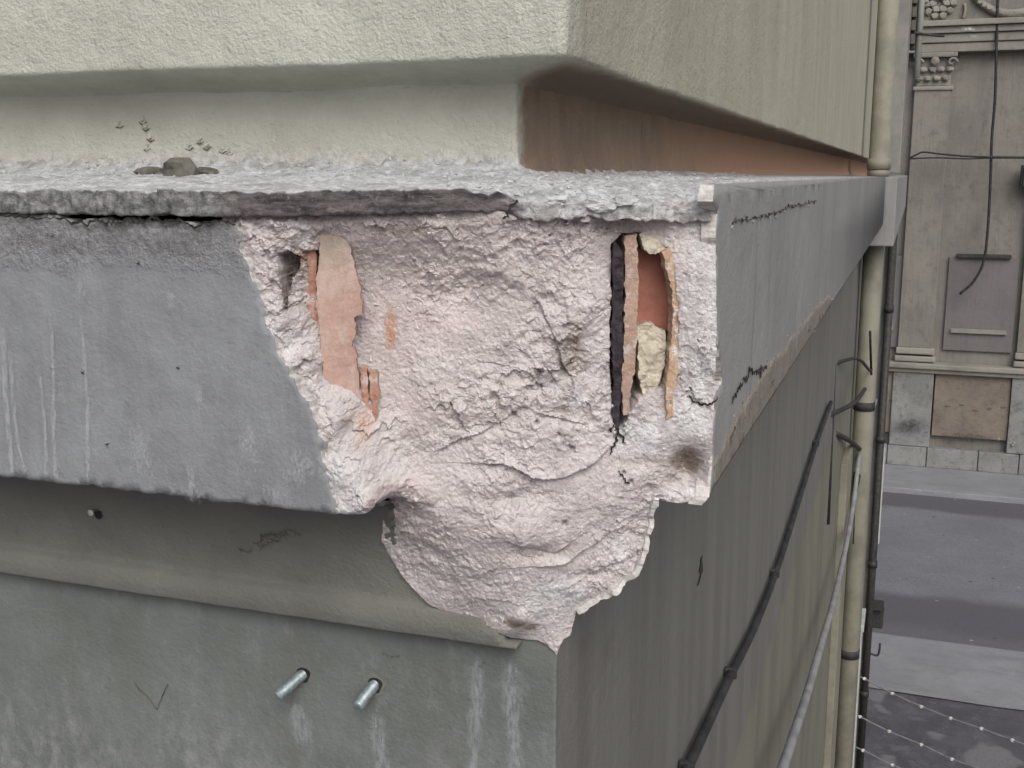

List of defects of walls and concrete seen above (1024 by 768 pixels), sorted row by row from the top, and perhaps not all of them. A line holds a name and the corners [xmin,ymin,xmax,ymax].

spalling [222,209,834,655]